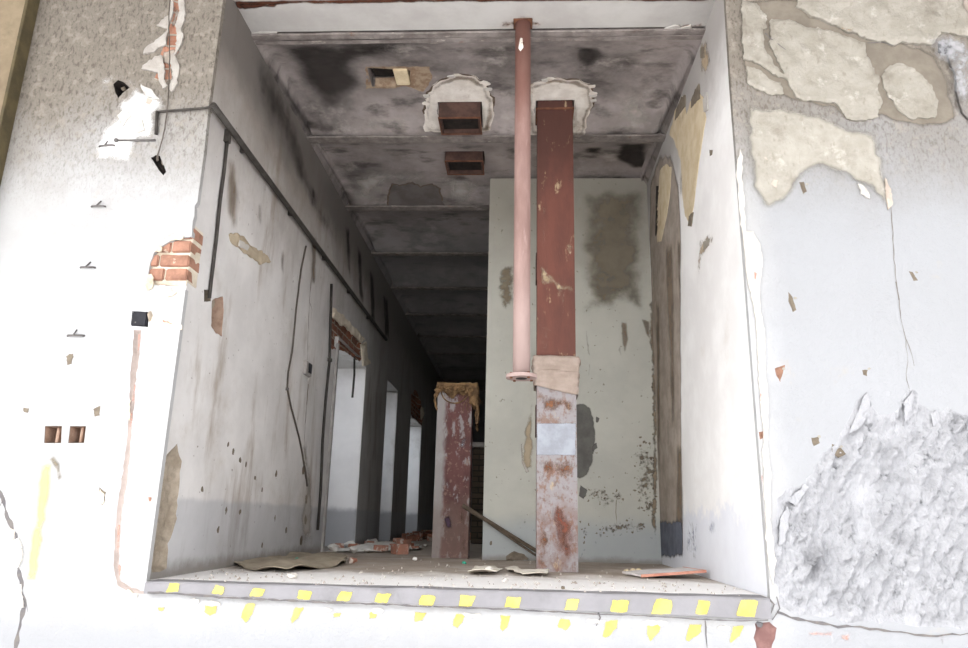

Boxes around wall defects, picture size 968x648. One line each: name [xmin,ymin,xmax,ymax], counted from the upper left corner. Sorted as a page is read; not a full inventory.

peeling [99,0,186,158]
damp [580,49,601,65]
flaking render [144,226,224,336]
damp [587,194,638,303]
spalling [736,0,968,630]
crack [891,210,914,386]
crack [0,490,28,648]
spalling [148,444,182,572]
corrosion [542,508,571,555]
corrosion [544,464,570,475]
corrosion [545,399,571,410]
damp [576,404,599,499]